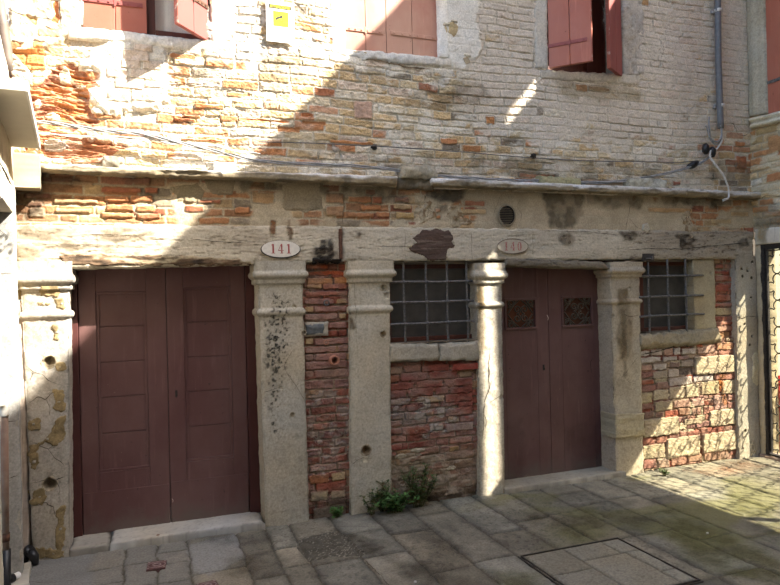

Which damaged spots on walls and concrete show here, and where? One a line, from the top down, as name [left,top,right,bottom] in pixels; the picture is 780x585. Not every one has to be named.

flaking render [11,0,60,49]
spalling [30,62,127,163]
peeling [139,105,158,114]
damp [543,193,584,228]
flaking render [37,285,66,311]
spalling [40,355,67,371]
damp [265,294,289,405]
crack [482,348,501,436]
flaking render [27,389,66,470]
flaking render [28,476,58,506]
flaking render [36,505,66,559]